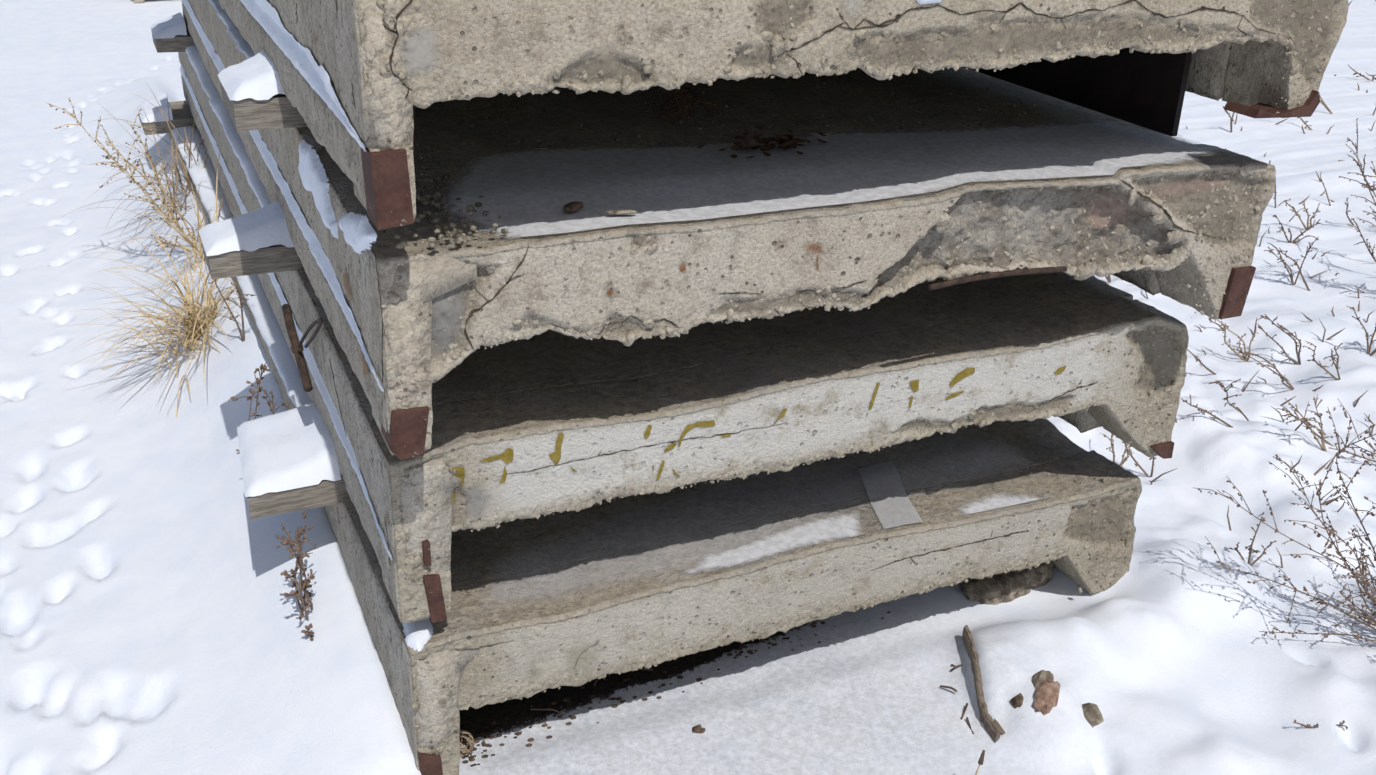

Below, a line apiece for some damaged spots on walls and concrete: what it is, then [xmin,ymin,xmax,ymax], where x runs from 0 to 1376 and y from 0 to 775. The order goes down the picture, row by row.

crack [383,0,413,98]
crack [768,0,1289,65]
crack [1119,179,1229,243]
crack [464,244,529,349]
rust [282,304,323,392]